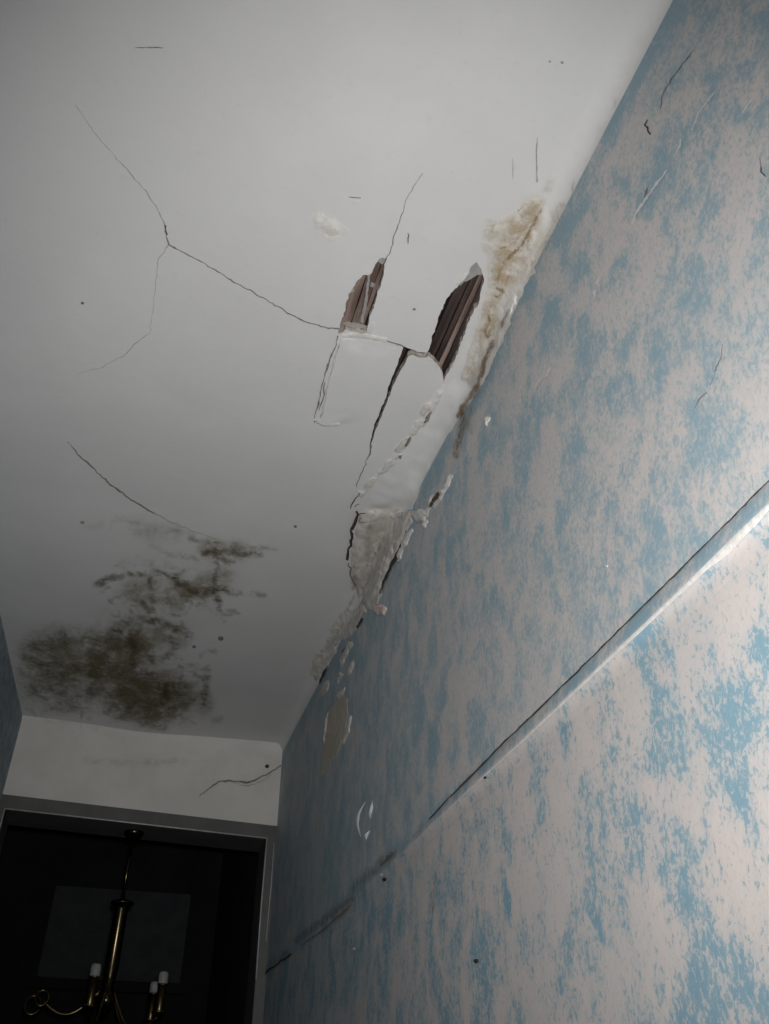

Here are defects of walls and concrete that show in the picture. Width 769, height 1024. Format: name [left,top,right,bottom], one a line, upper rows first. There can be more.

crack [75,105,339,418]
flaking render [338,258,388,342]
crack [385,173,423,260]
peeling [358,197,550,498]
leakage [485,206,537,336]
crack [69,443,215,539]
crack [346,340,427,594]
crack [319,613,364,683]
flaking render [310,508,428,697]
crack [199,765,281,797]